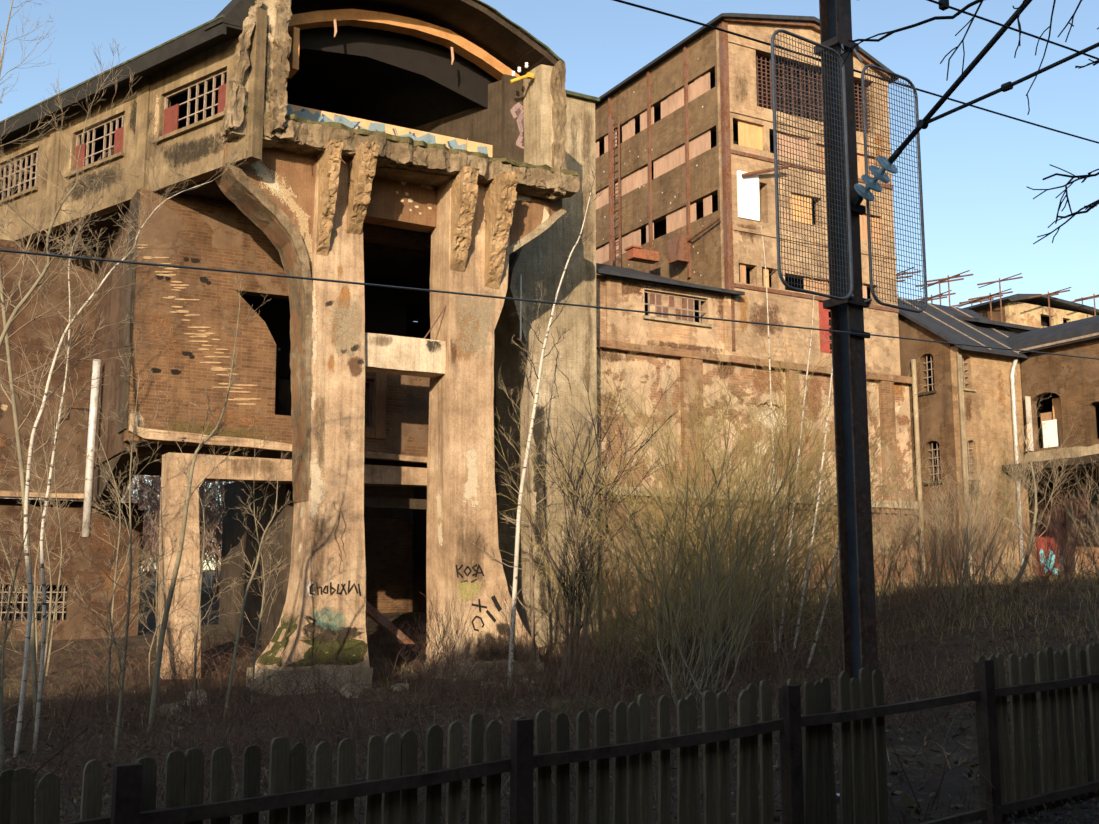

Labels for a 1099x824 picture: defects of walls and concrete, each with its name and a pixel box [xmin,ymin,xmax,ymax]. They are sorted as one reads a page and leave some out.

spalling [137,244,261,405]
spalling [312,281,362,376]
peeling [300,387,325,519]